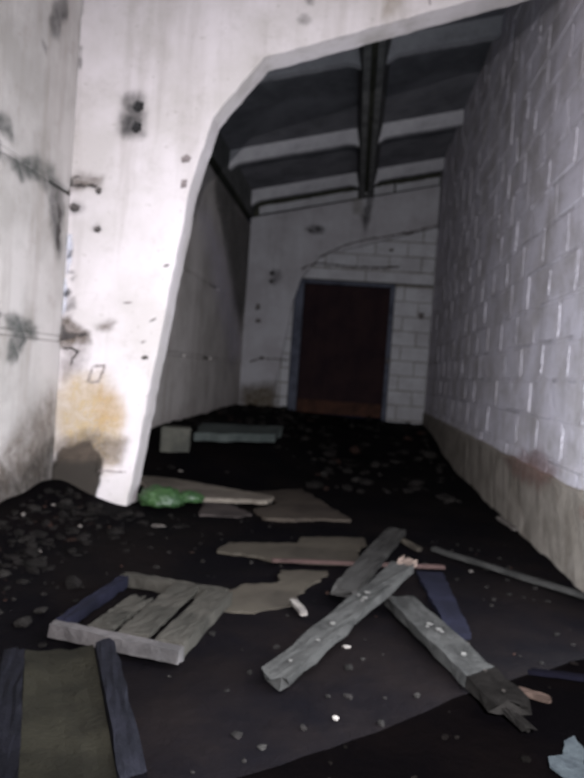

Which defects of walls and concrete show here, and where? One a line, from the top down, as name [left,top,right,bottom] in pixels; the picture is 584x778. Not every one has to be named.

water stain [14,159,36,180]
water stain [7,317,33,359]